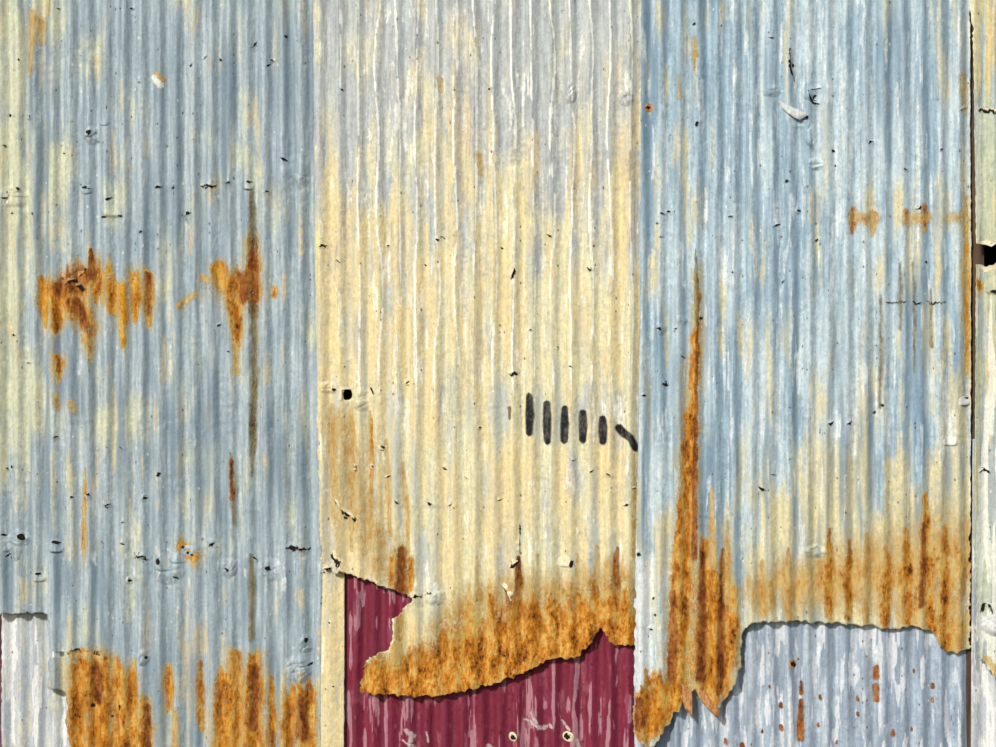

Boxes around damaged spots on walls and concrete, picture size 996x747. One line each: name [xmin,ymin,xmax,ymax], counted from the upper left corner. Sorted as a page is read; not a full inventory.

rust [36,246,156,371]
rust [176,292,197,309]
rust [200,181,277,476]
rust [633,249,971,747]
rust [360,454,637,698]
rust [66,648,155,747]
rust [162,664,179,747]
rust [195,554,318,747]
peeling [523,711,581,747]